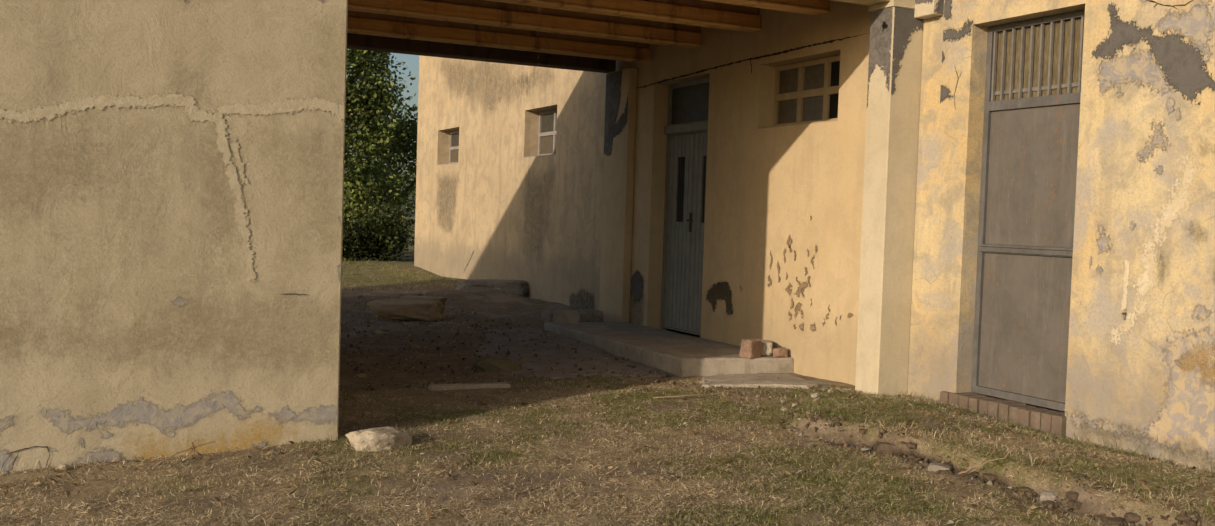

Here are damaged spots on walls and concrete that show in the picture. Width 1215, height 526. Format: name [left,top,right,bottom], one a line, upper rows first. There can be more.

flaking render [867,0,973,107]
flaking render [1092,0,1215,176]
crack [1147,0,1193,9]
peeling [705,281,741,315]
peeling [767,234,853,332]
peeling [1089,224,1112,276]
peeling [38,390,338,448]
peeling [1064,304,1215,466]